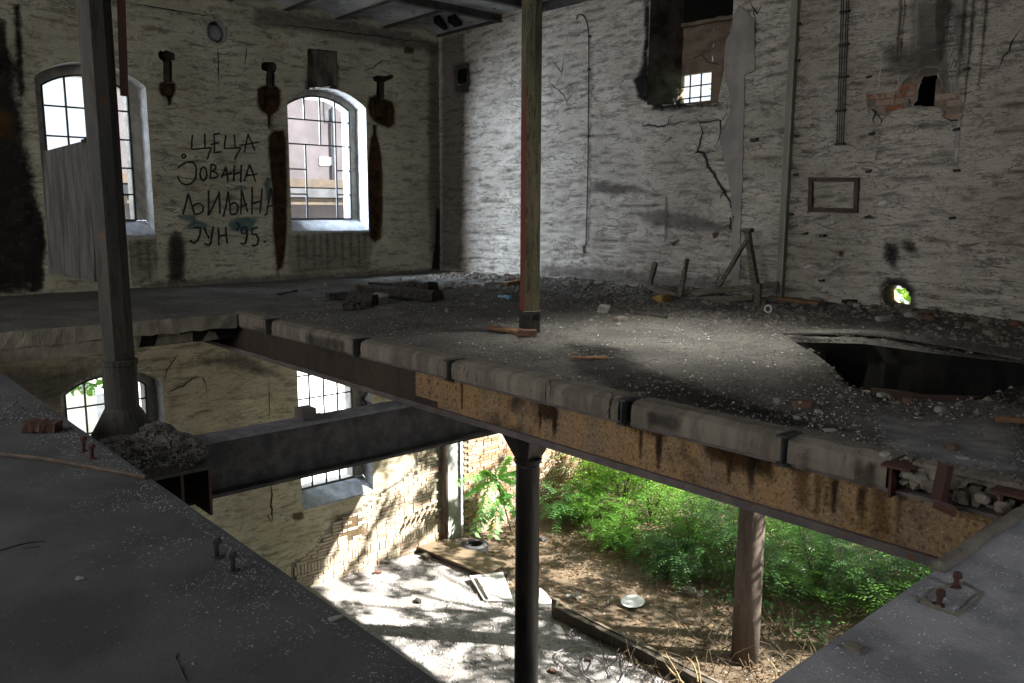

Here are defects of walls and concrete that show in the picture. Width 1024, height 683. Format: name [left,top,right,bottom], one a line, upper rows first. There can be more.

water stain [0,4,25,96]
water stain [878,0,988,98]
flaking render [866,67,965,120]
crack [642,107,734,235]
water stain [28,205,46,291]
crack [164,356,208,396]
spalling [797,342,1024,404]